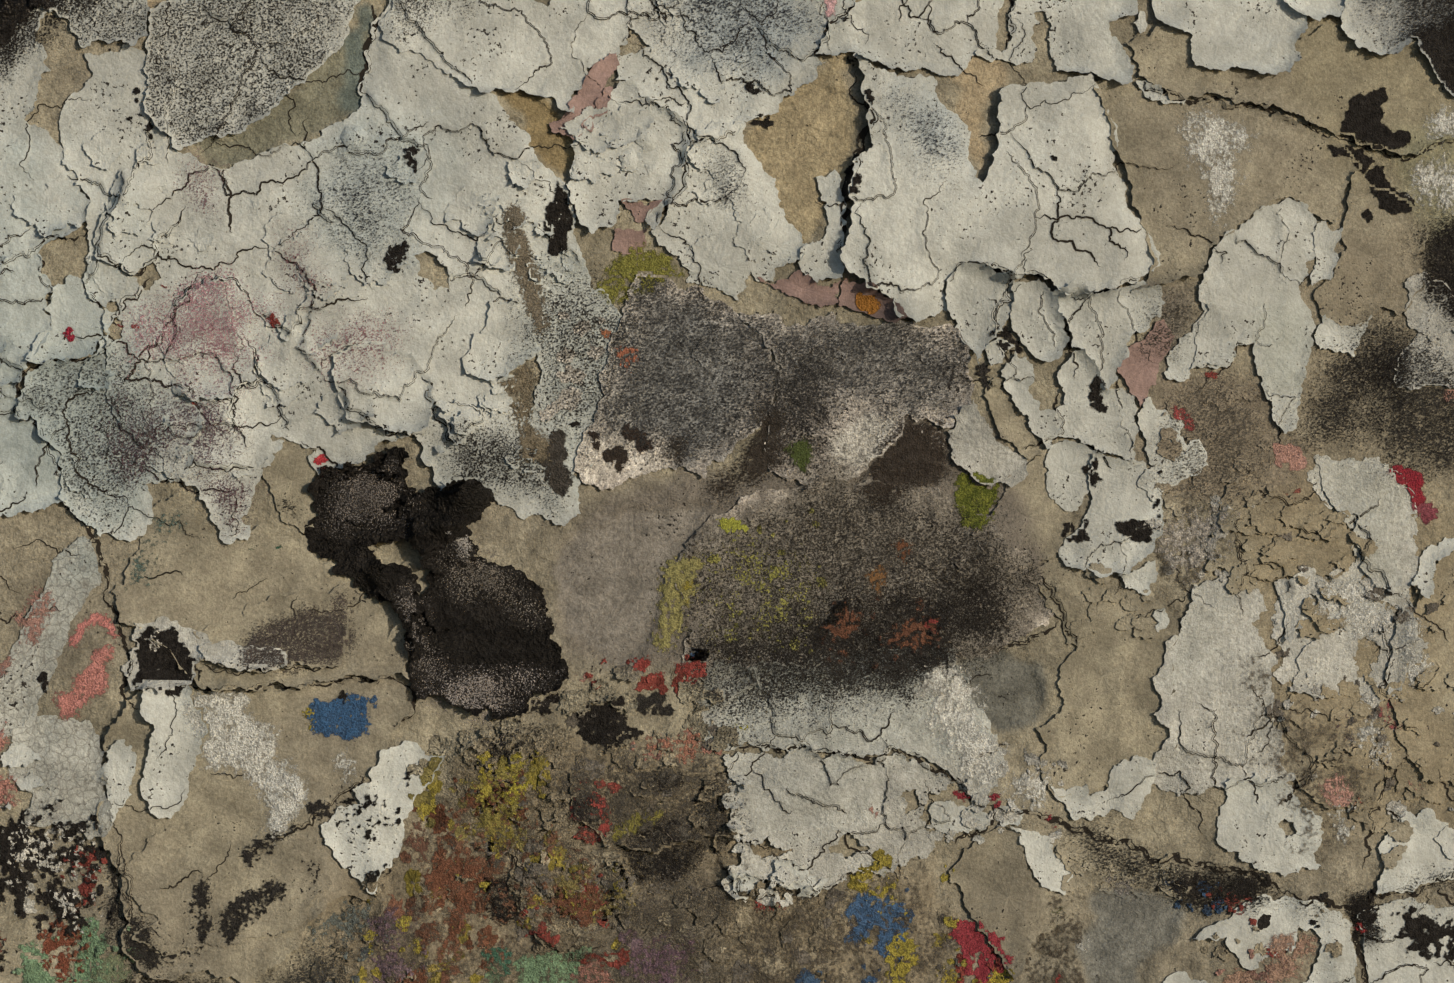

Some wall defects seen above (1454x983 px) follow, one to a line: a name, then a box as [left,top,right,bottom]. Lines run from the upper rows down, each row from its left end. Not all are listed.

crack [479,0,1316,468]
crack [0,0,590,710]
crack [159,578,417,756]
crack [682,489,1454,983]
peeling [425,716,629,903]
crack [503,846,605,961]
peeling [520,880,855,983]
peeling [756,866,800,907]
peeling [928,800,990,843]
peeling [1193,894,1357,983]
peeling [1357,897,1454,983]
peeling [1376,808,1454,894]